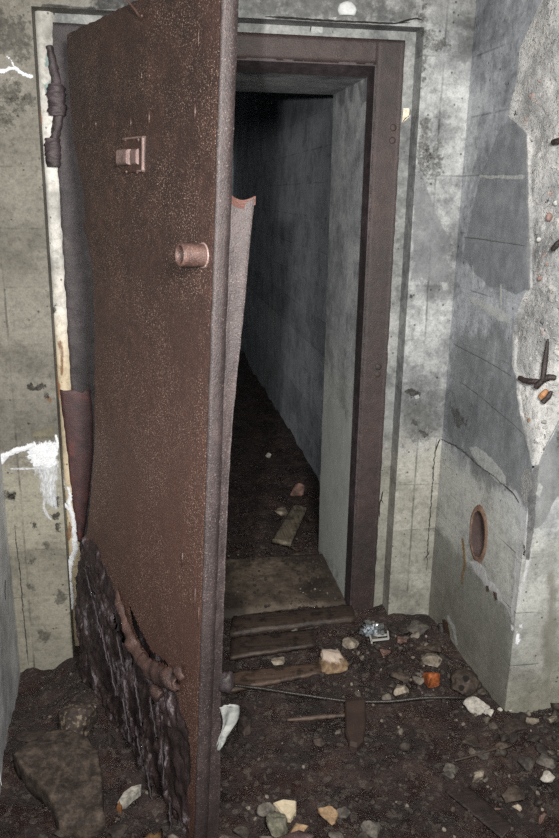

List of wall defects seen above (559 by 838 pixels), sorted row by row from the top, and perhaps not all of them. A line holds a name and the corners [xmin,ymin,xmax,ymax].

crack [0,56,33,79]
spalling [508,0,559,560]
water stain [1,427,59,520]
crack [425,439,519,571]